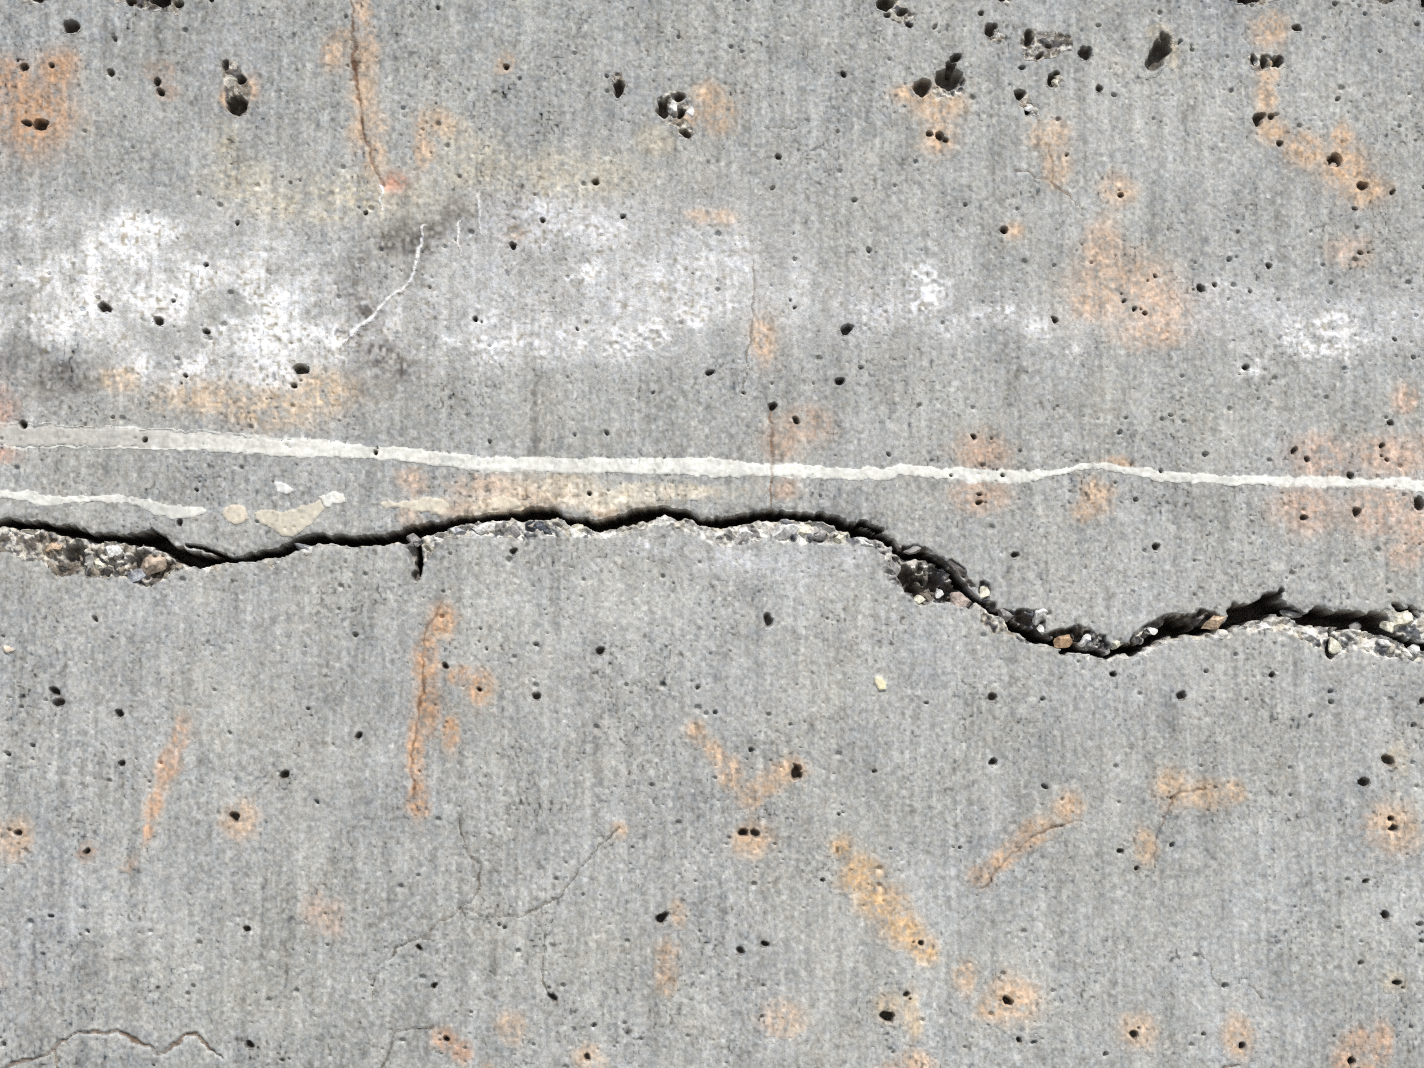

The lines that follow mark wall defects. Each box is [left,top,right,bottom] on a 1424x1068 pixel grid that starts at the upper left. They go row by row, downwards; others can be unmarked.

rust [0,35,114,182]
rust [315,0,466,197]
rust [1242,3,1406,274]
damp [0,109,1424,520]
rust [1038,161,1217,356]
damp [0,480,347,536]
crack [0,266,1424,665]
damp [604,527,877,594]
crack [410,676,426,799]
rust [678,711,816,867]
rust [819,828,1055,1068]
rust [1320,966,1411,1068]